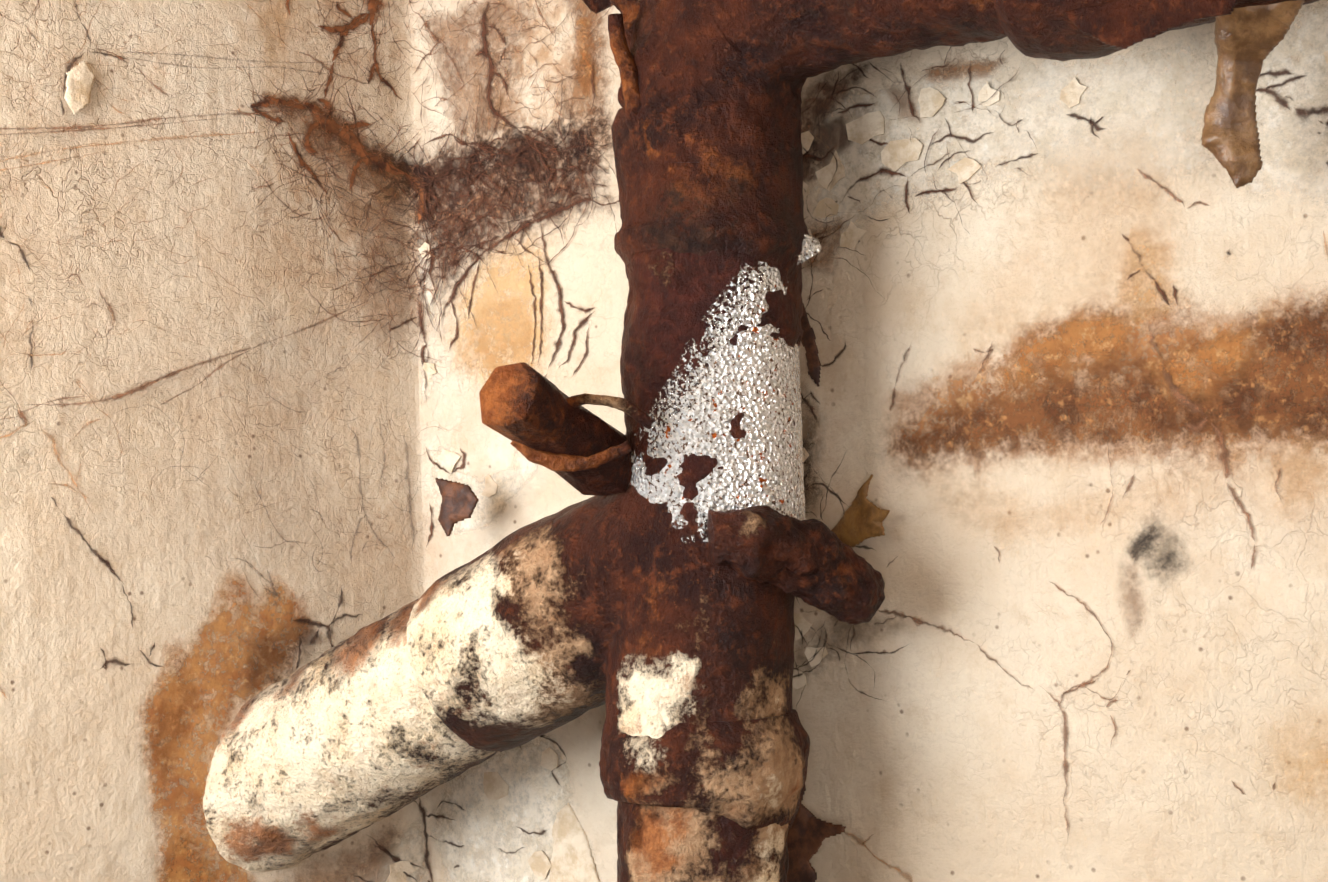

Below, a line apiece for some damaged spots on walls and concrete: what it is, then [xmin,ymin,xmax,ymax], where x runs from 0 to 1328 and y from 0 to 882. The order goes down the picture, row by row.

crack [0,0,168,116]
damp [278,104,593,222]
crack [836,67,1021,212]
crack [999,153,1038,165]
crack [1067,114,1105,139]
crack [1139,170,1207,208]
crack [0,227,33,369]
corrosion [894,299,1328,466]
crack [0,382,160,670]
corrosion [144,578,309,882]
crack [875,610,1018,682]
crack [1050,583,1130,830]